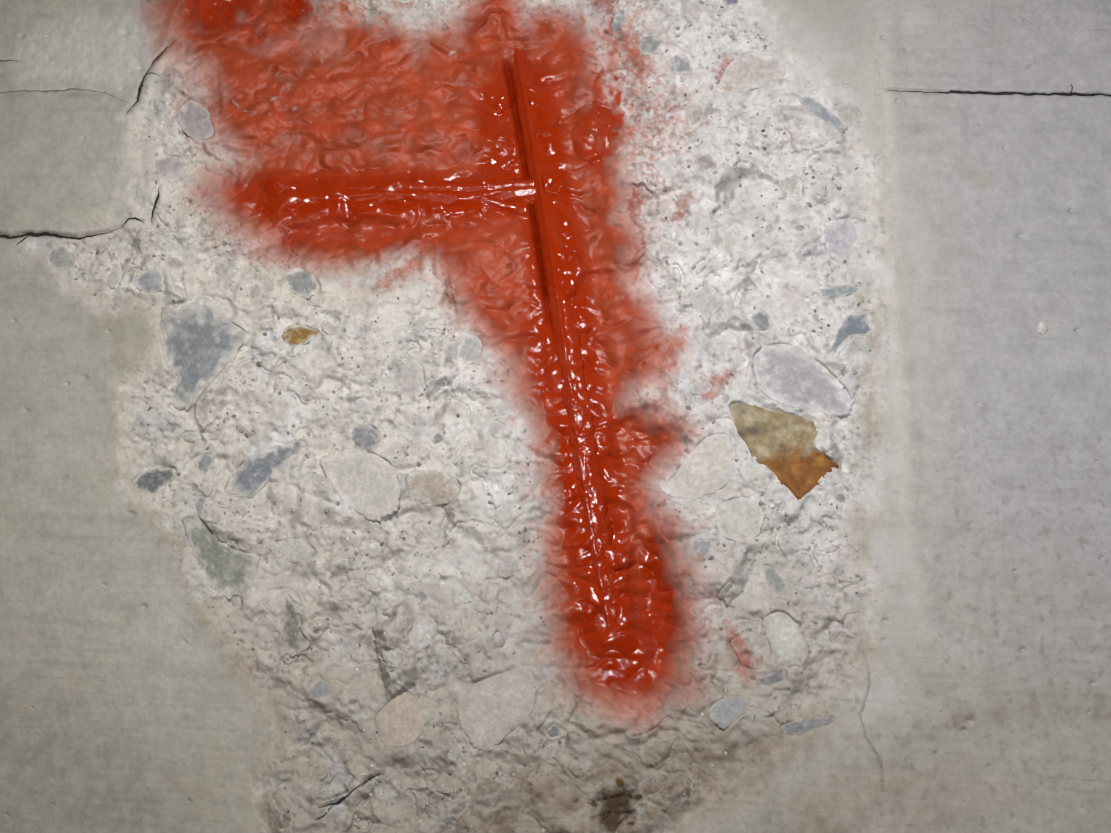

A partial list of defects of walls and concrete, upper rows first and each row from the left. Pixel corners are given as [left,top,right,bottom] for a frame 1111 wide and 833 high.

crack [0,40,174,112]
crack [894,83,1111,96]
crack [0,189,159,245]
spalling [30,0,888,833]